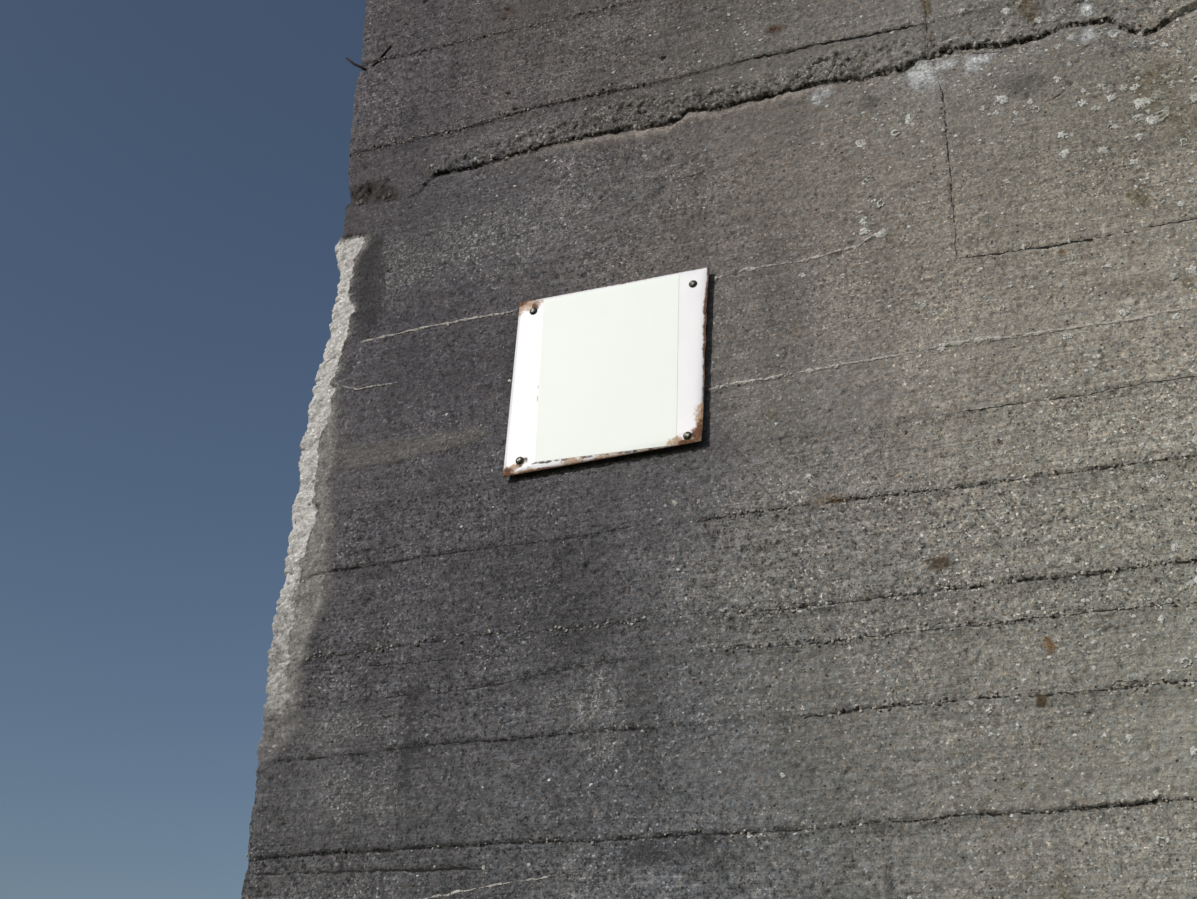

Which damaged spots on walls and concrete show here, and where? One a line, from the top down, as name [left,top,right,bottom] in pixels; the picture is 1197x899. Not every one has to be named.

crack [373,0,638,62]
crack [349,82,645,157]
crack [431,1,1197,262]
spalling [263,234,369,757]
crack [703,453,1195,525]
crack [718,557,1197,653]
crack [803,672,1196,719]
crack [278,726,659,762]
crack [245,796,1197,875]